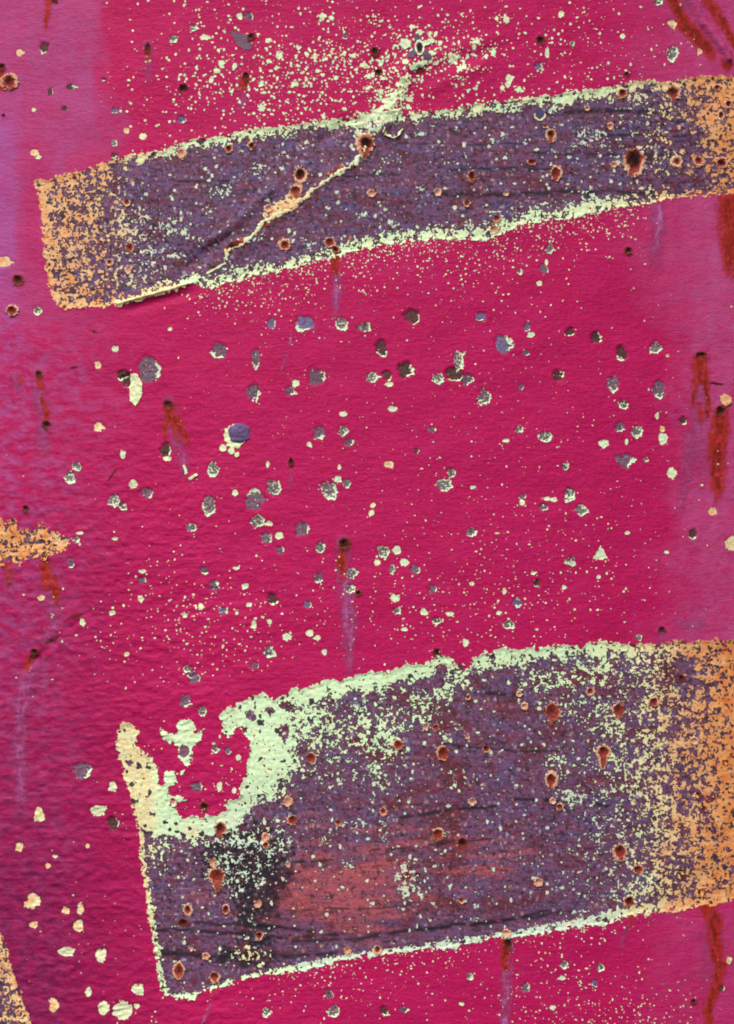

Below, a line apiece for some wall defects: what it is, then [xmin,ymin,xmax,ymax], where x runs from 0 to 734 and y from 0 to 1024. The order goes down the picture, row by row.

rust [667,0,734,70]
crack [206,146,366,274]
peeling [34,33,734,311]
rust [717,195,734,277]
peeling [118,356,162,406]
peeling [431,350,491,406]
rust [691,355,729,497]
peeling [0,505,83,568]
peeling [232,461,284,554]
rust [337,537,356,668]
peeling [108,627,734,1001]
rust [700,903,726,1024]